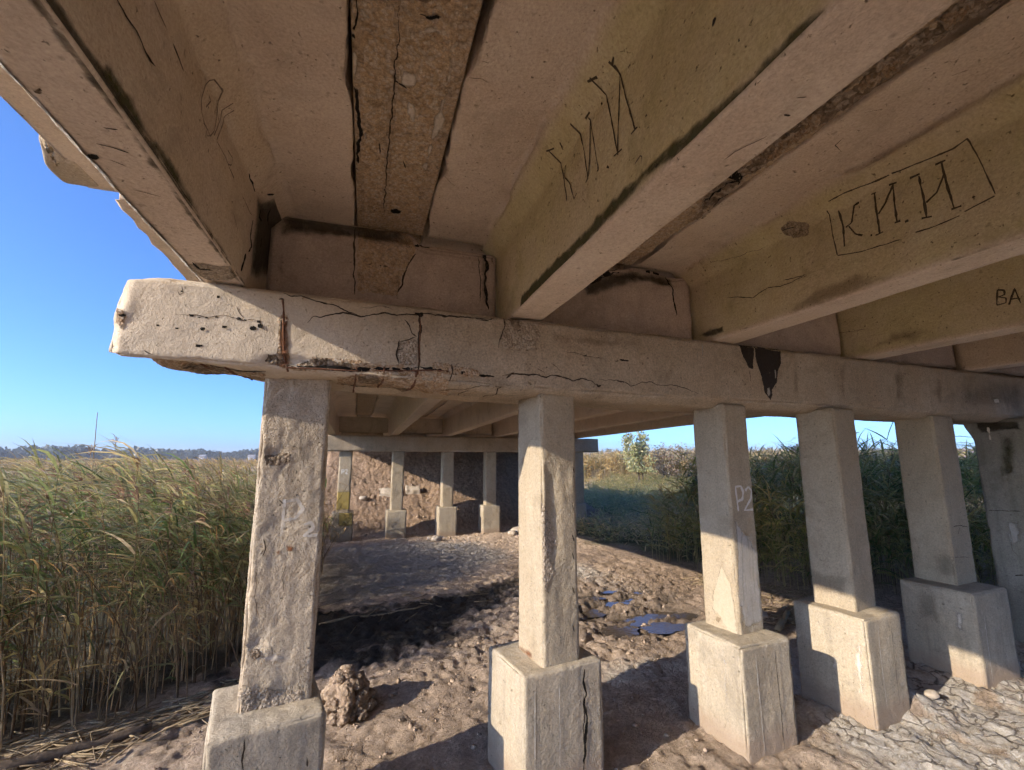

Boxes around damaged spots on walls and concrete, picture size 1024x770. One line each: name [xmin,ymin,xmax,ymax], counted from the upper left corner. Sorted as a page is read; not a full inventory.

crack [117,0,184,71]
crack [351,0,359,39]
crack [347,6,406,212]
spalling [781,221,809,238]
crack [284,235,494,337]
corrosion [279,298,289,372]
spalling [152,315,499,396]
crack [458,351,698,397]
leakage [739,345,781,400]
crack [534,669,603,770]